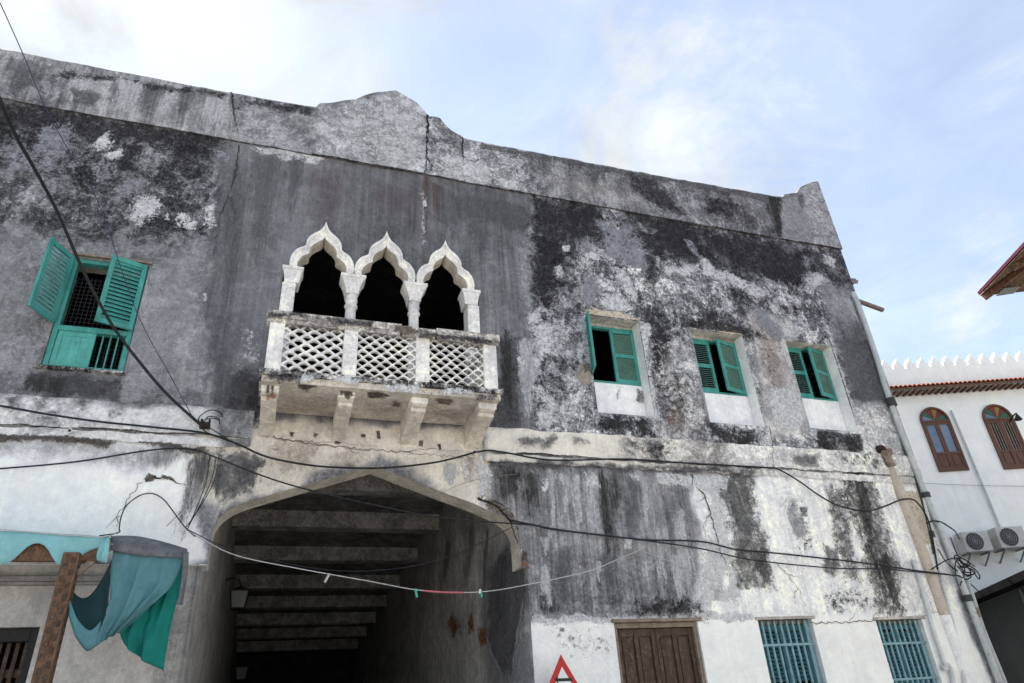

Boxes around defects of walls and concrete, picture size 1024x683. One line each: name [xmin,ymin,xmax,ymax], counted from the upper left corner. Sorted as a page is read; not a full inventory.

water stain [109,139,143,173]
crack [211,92,240,253]
water stain [480,143,886,402]
water stain [268,311,373,327]
water stain [6,371,121,423]
water stain [419,329,776,620]
water stain [814,431,865,453]
crack [698,488,726,562]
water stain [819,472,907,617]